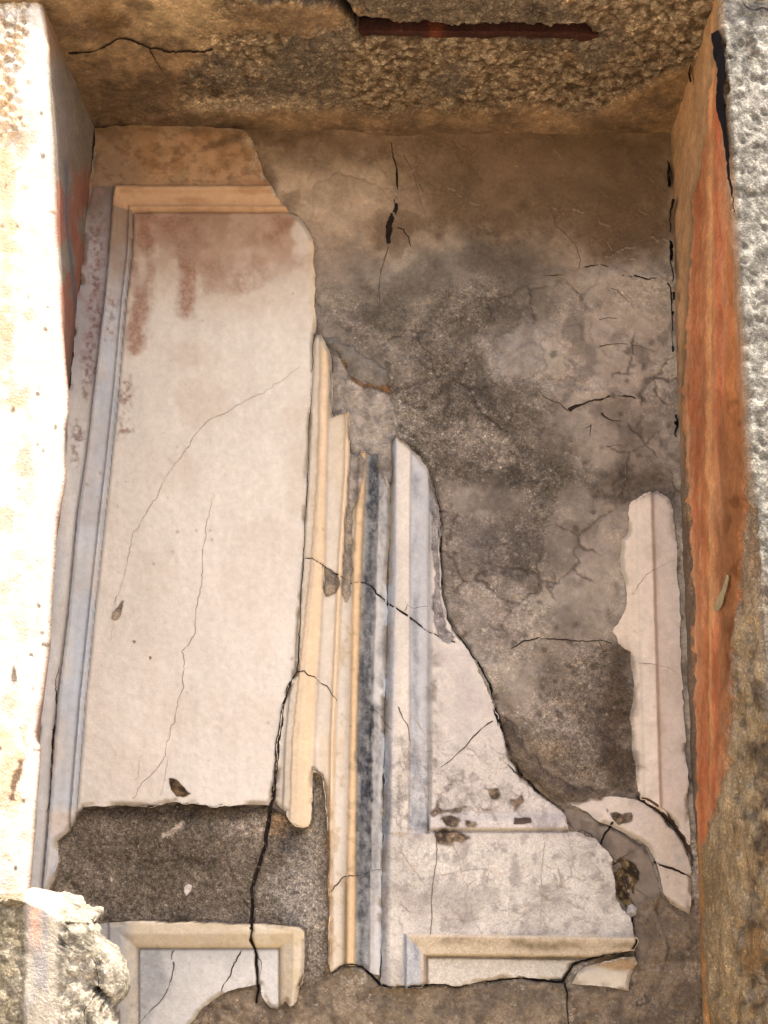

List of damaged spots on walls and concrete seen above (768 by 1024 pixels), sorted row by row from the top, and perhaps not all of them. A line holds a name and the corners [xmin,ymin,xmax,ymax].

crack [69,38,213,75]
crack [378,142,430,310]
crack [547,160,675,352]
spalling [323,354,398,602]
crack [502,380,636,447]
crack [672,414,680,437]
spalling [430,481,454,643]
crack [110,334,591,1003]
crack [511,637,612,668]
spalling [53,766,703,1024]
crack [600,796,694,878]